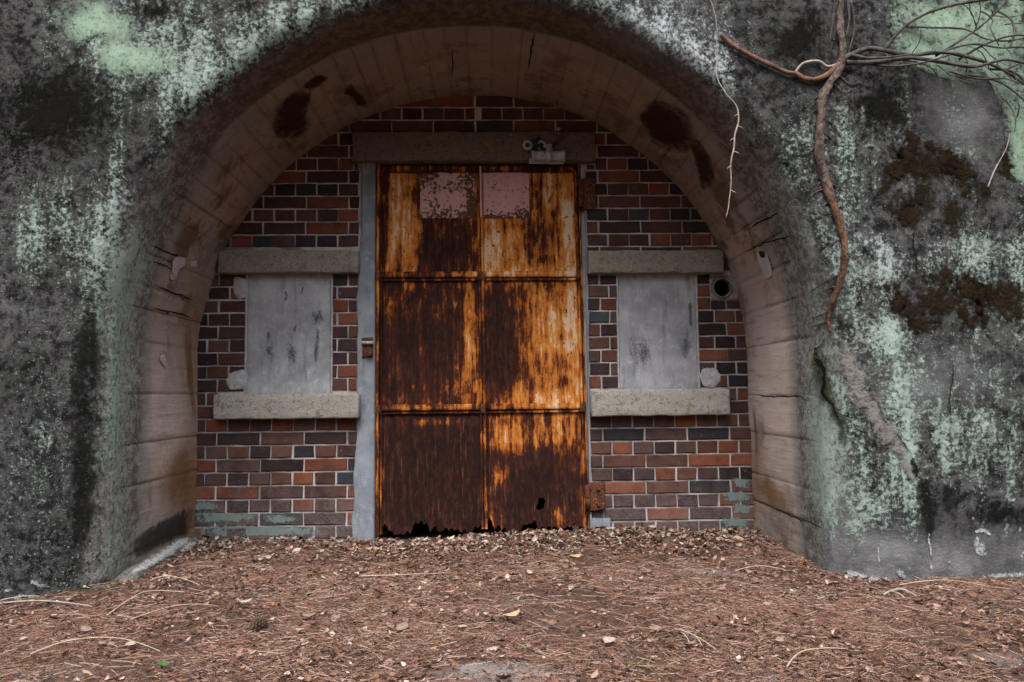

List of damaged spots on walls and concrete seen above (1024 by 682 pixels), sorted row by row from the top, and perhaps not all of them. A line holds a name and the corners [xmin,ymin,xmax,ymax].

crack [527,34,535,69]
leakage [211,75,327,160]
leakage [640,101,714,189]
crack [745,213,789,252]
crack [152,245,191,318]
crack [759,340,848,427]
leakage [64,310,112,559]
leakage [132,509,195,573]
leakage [910,458,957,569]
leakage [967,501,1024,555]